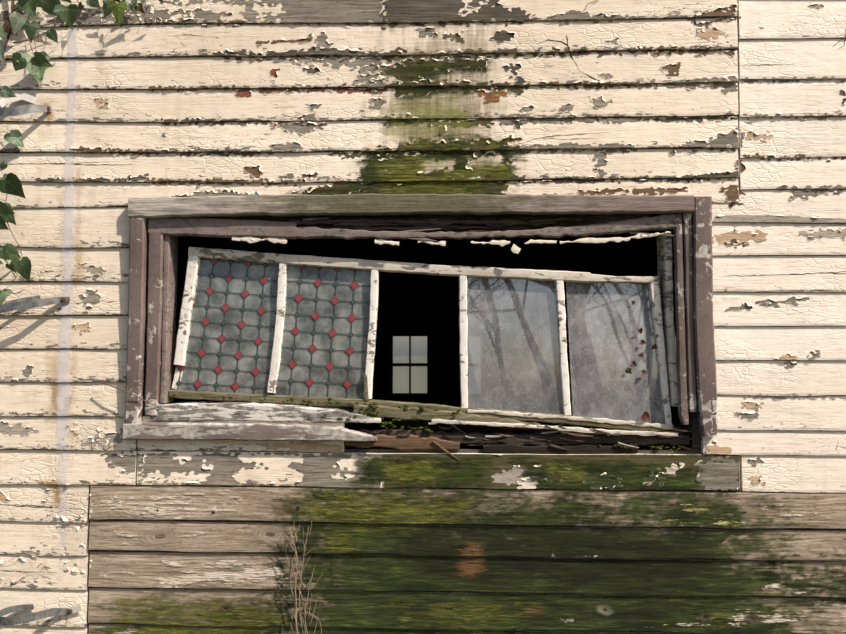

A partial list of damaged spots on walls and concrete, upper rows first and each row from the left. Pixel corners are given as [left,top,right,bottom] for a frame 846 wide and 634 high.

crack [538,36,599,81]
peeling [35,0,846,249]
damp [396,57,492,160]
peeling [471,231,671,254]
peeling [79,288,102,310]
peeling [725,296,810,312]
peeling [0,420,39,437]
peeling [67,422,383,488]
damp [511,456,703,490]
peeling [694,439,732,482]
peeling [747,457,767,486]
peeling [0,478,93,588]